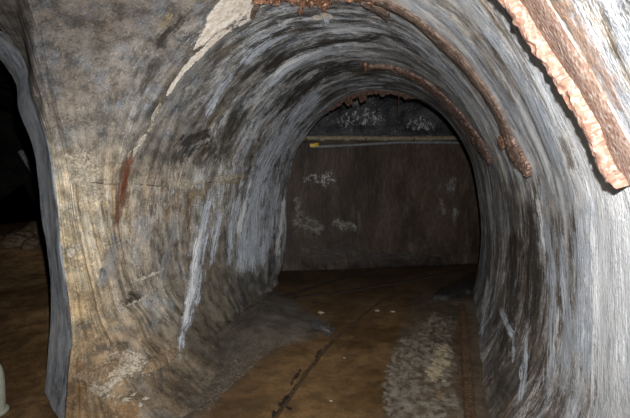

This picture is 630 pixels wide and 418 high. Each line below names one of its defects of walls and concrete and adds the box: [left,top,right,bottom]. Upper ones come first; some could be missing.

spalling [166,0,260,105]
water stain [239,28,292,67]
water stain [261,34,383,88]
flaking render [127,104,162,159]
corrosion [115,153,135,225]
water stain [172,57,358,361]